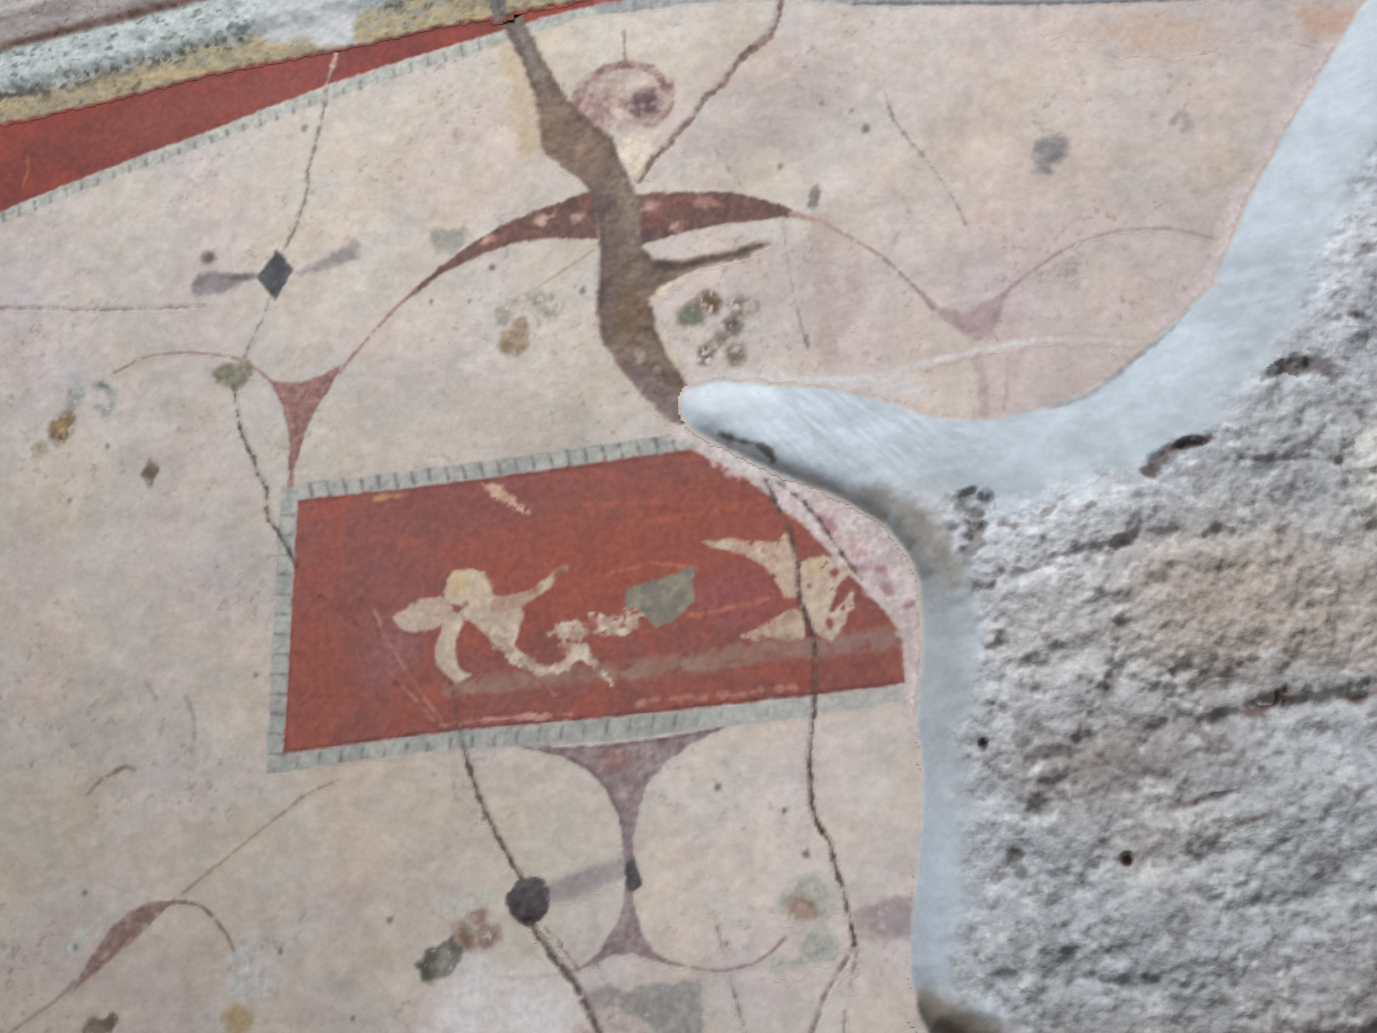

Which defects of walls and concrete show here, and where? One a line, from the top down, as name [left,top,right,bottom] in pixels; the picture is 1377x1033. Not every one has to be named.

crack [0,302,208,315]
crack [282,51,342,252]
crack [485,0,813,429]
spalling [848,105,873,136]
crack [229,295,611,1033]
spalling [711,780,725,794]
spalling [667,425,920,721]
spalling [799,844,813,862]
crack [761,478,864,1033]
flaking render [947,151,1377,1033]
crack [708,909,751,1033]